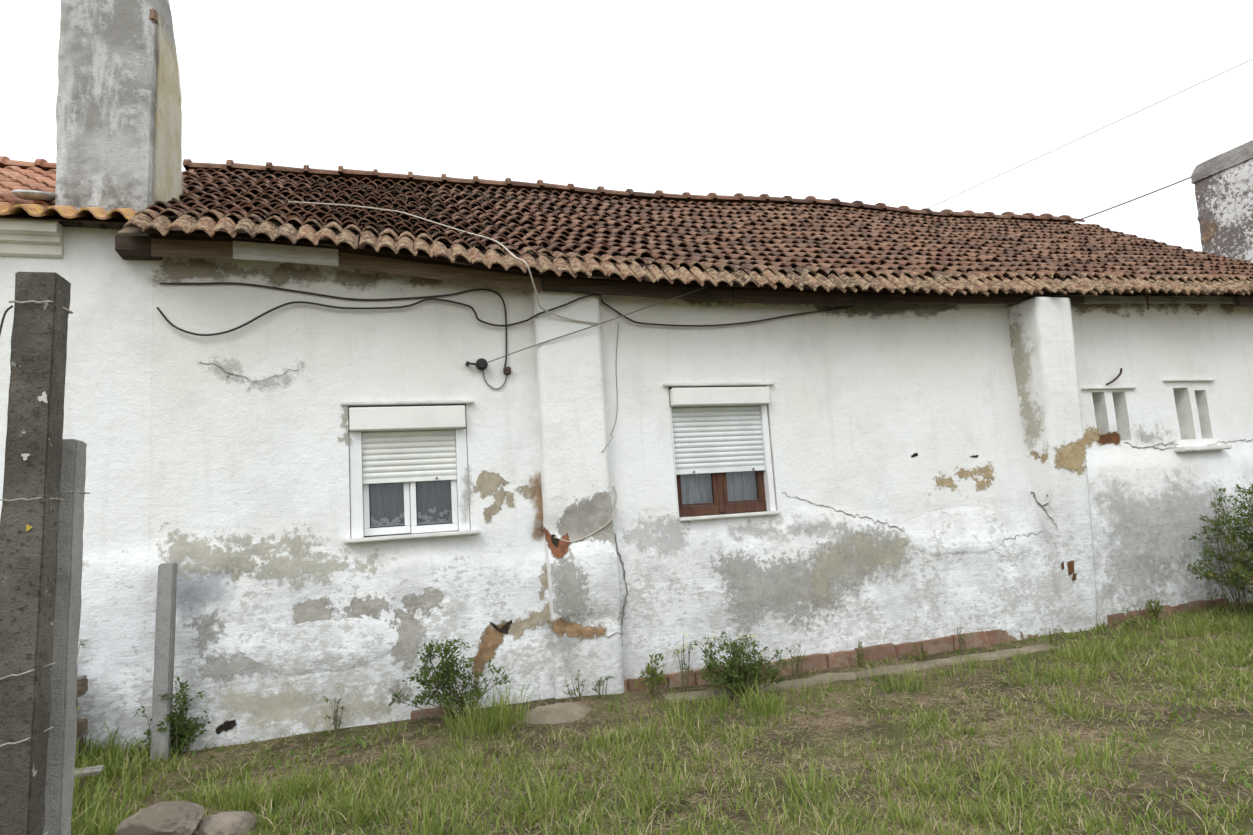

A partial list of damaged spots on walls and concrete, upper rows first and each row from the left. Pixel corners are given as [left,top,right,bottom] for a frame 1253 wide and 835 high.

crack [197,362,296,383]
leakage [1009,315,1042,447]
leakage [157,522,378,603]
flaking render [463,468,535,523]
flaking render [470,491,615,682]
crack [605,519,628,647]
leakage [623,519,684,553]
leakage [728,518,906,601]
crack [782,492,905,532]
peeling [933,455,995,491]
peeling [1028,425,1123,475]
leakage [224,686,390,733]